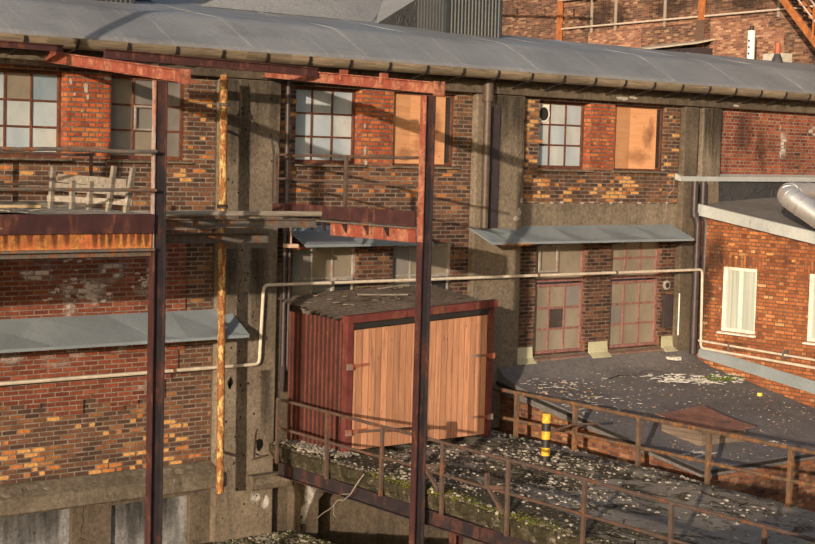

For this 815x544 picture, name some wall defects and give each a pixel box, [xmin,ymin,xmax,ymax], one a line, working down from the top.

corrosion [0,234,72,248]
corrosion [92,233,149,246]
peeling [42,258,111,303]